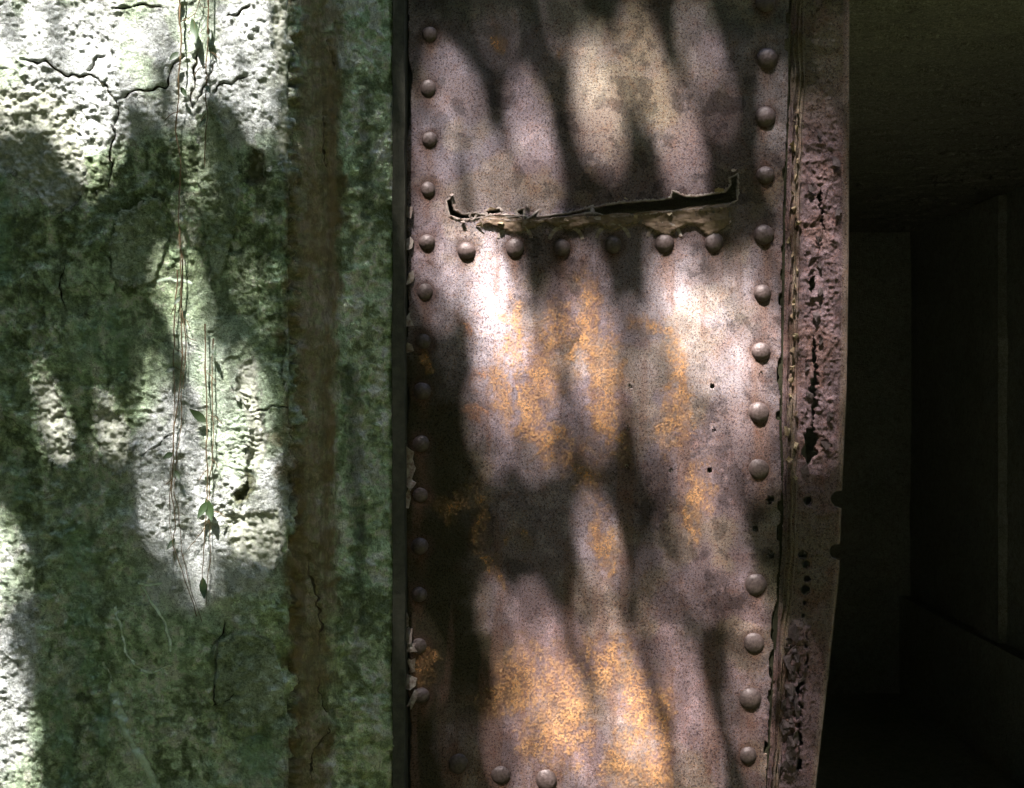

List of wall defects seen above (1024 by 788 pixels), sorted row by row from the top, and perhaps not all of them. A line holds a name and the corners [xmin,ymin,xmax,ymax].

crack [28,53,245,186]
corrosion [468,288,626,461]
corrosion [630,319,691,446]
peeling [406,462,416,508]
corrosion [683,470,708,541]
damp [92,662,160,788]
peeling [406,627,417,652]
peeling [406,674,418,710]
corrosion [488,640,671,786]
corrosion [777,624,805,774]